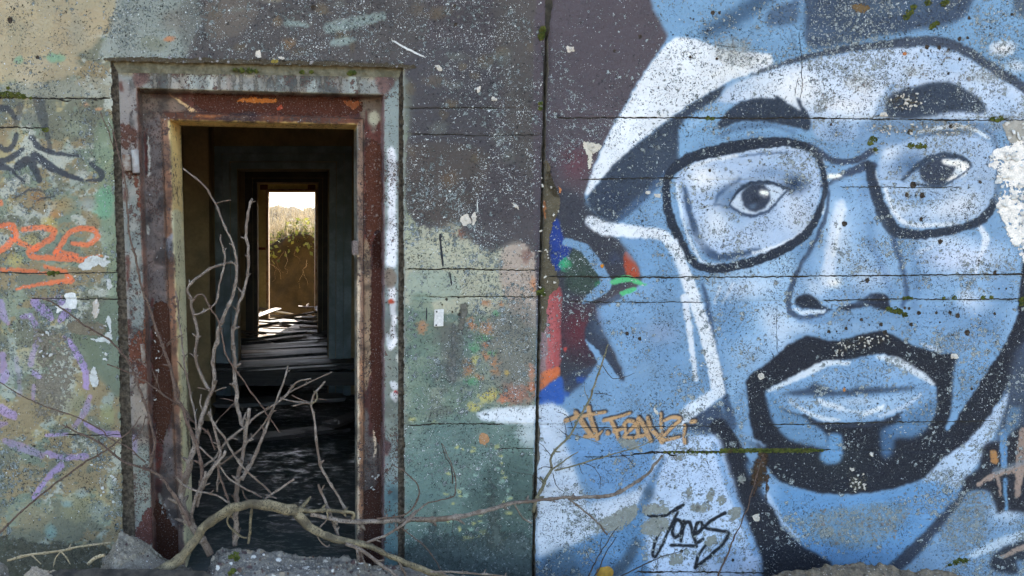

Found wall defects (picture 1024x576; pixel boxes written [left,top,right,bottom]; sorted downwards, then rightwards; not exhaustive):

rust [192,92,363,117]
rust [120,123,142,220]
peeling [989,120,1024,263]
rust [363,139,384,443]
rust [128,300,173,444]
rust [135,501,179,560]
rust [364,474,383,566]